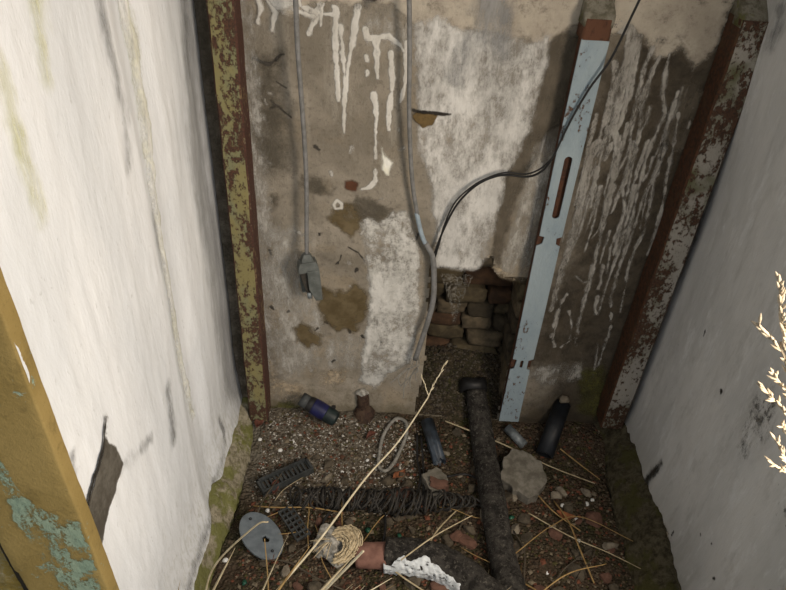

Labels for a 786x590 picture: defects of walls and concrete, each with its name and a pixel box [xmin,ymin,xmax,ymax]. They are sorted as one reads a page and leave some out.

leakage [254,0,407,190]
leakage [328,203,364,236]
peeling [282,0,583,281]
leakage [493,33,579,263]
leakage [549,15,704,370]
flaking render [610,0,735,67]
leakage [318,284,368,332]
peeling [0,462,101,590]
spalling [87,417,123,543]